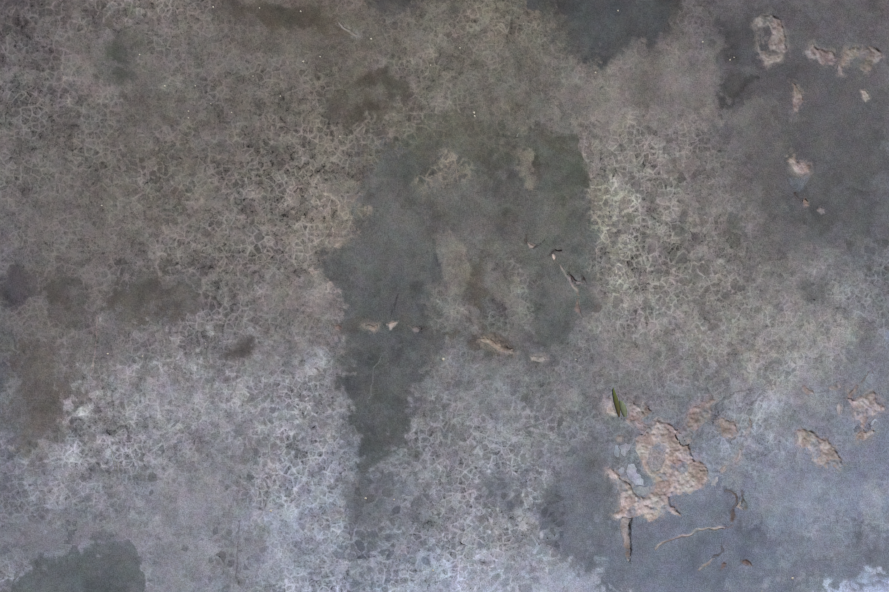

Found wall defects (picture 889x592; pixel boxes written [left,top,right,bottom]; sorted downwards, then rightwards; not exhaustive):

spalling [748,8,889,104]
spalling [786,77,809,120]
spalling [780,151,815,180]
water stain [480,258,532,329]
spalling [473,329,553,368]
spalling [595,386,758,528]
spalling [789,379,889,477]